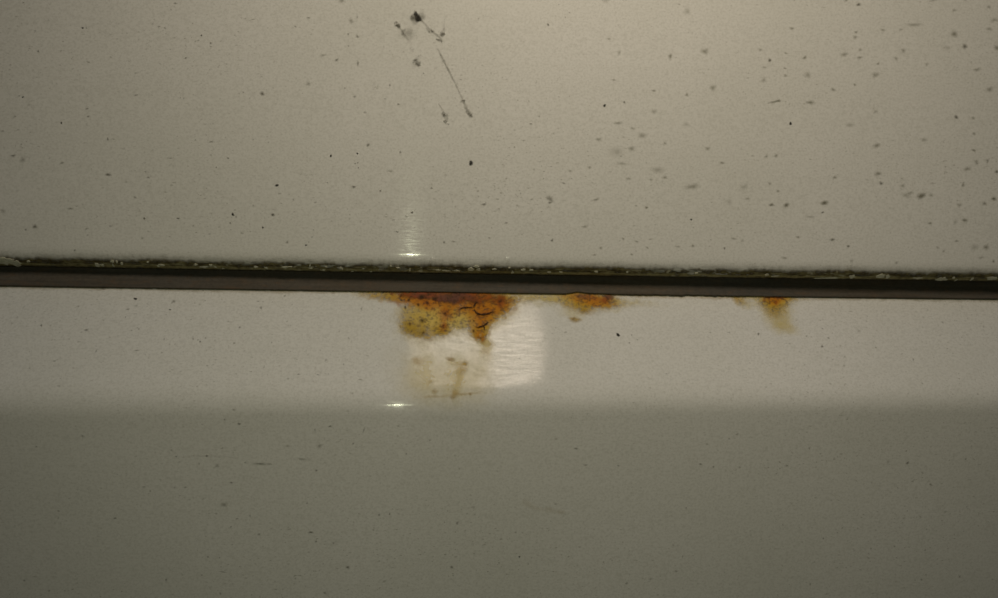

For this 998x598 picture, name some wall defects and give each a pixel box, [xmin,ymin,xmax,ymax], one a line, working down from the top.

rust [371,292,518,347]
rust [541,292,621,321]
rust [759,296,792,311]